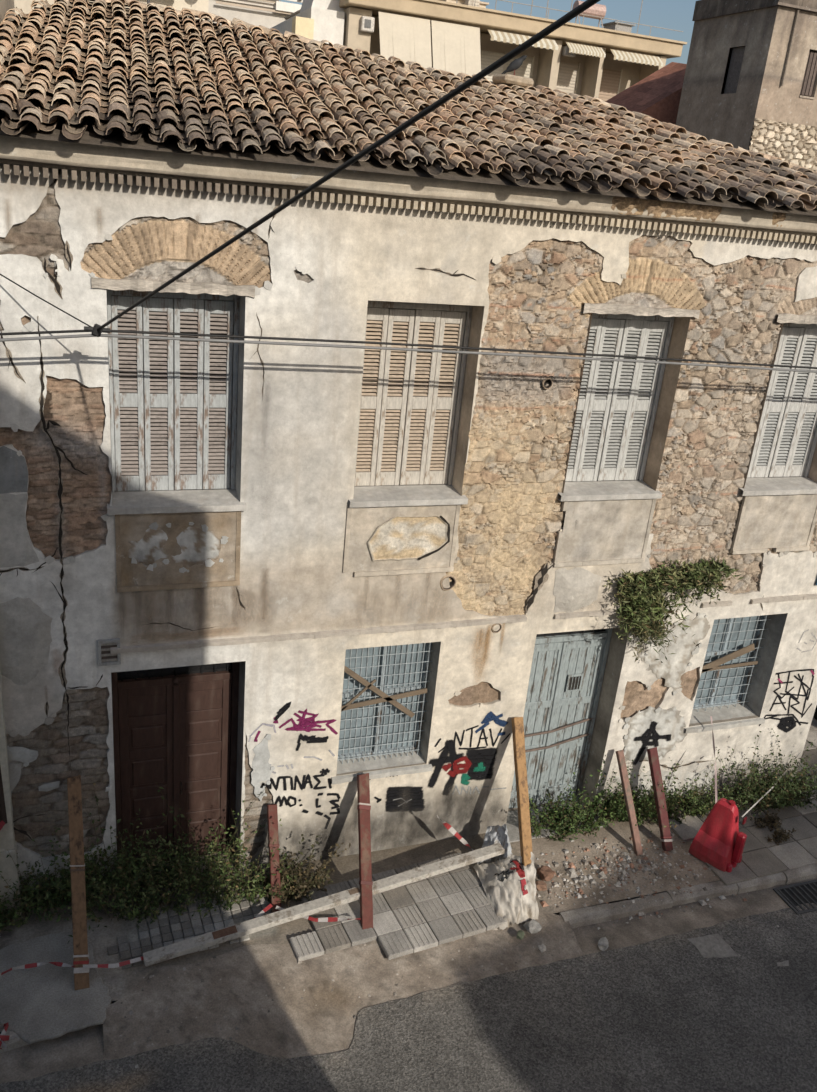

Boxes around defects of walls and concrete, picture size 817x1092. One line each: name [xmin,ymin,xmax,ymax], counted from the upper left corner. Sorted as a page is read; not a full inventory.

crack [42,241,73,299]
flaking render [0,182,273,295]
crack [0,316,103,773]
flaking render [0,375,112,565]
peeling [128,522,229,573]
flaking render [367,235,817,633]
flaking render [448,682,499,707]
peeling [618,613,710,765]
flaking render [6,687,112,857]